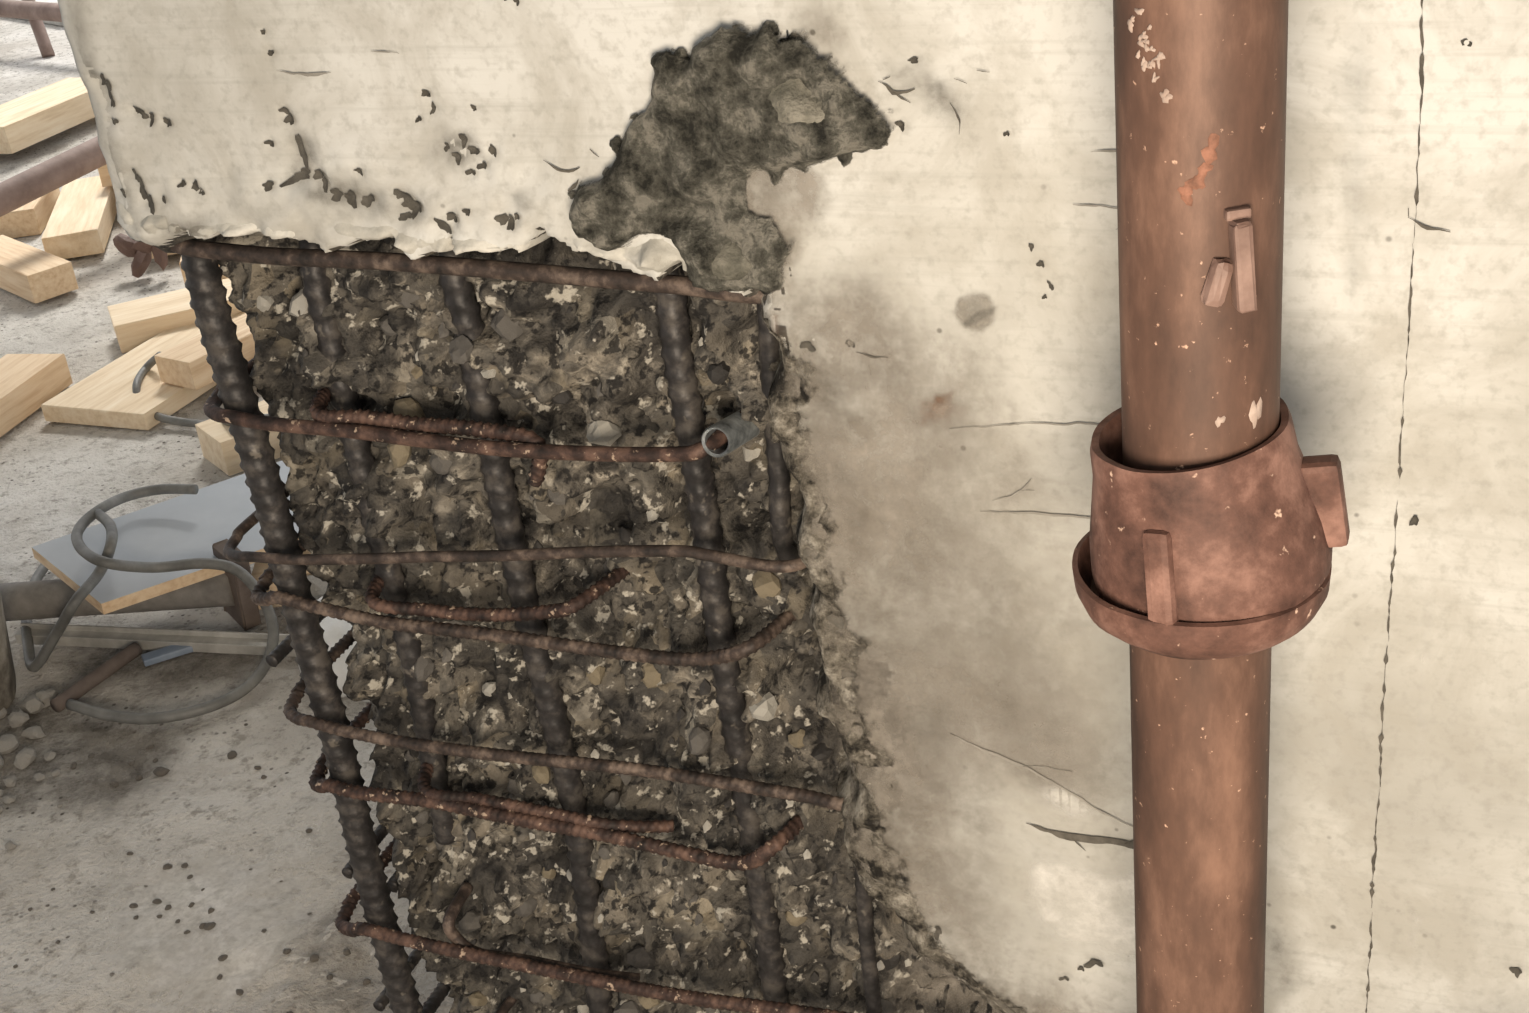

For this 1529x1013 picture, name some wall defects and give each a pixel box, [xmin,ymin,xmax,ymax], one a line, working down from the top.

peeling [762,21,804,43]
spalling [415,90,436,123]
spalling [262,107,375,209]
spalling [444,134,497,176]
peeling [602,136,623,176]
peeling [837,153,852,167]
damp [745,168,818,264]
spalling [1028,244,1054,299]
crack [1365,0,1450,1013]
spalling [131,189,1025,1013]
crack [950,733,1133,849]
spalling [1059,959,1103,981]